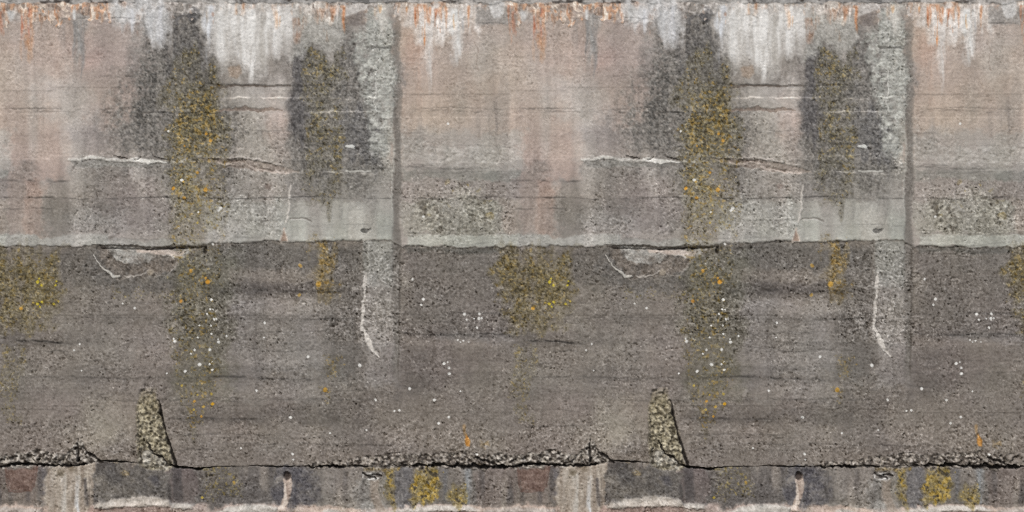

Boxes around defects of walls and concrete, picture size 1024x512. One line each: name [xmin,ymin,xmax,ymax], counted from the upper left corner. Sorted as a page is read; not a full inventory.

corrosion [18,7,44,64]
corrosion [917,3,983,113]
water stain [0,0,1024,224]
crack [0,460,135,469]
spalling [134,387,178,473]
crack [165,460,647,471]
spalling [646,387,690,473]
crack [677,462,1024,471]